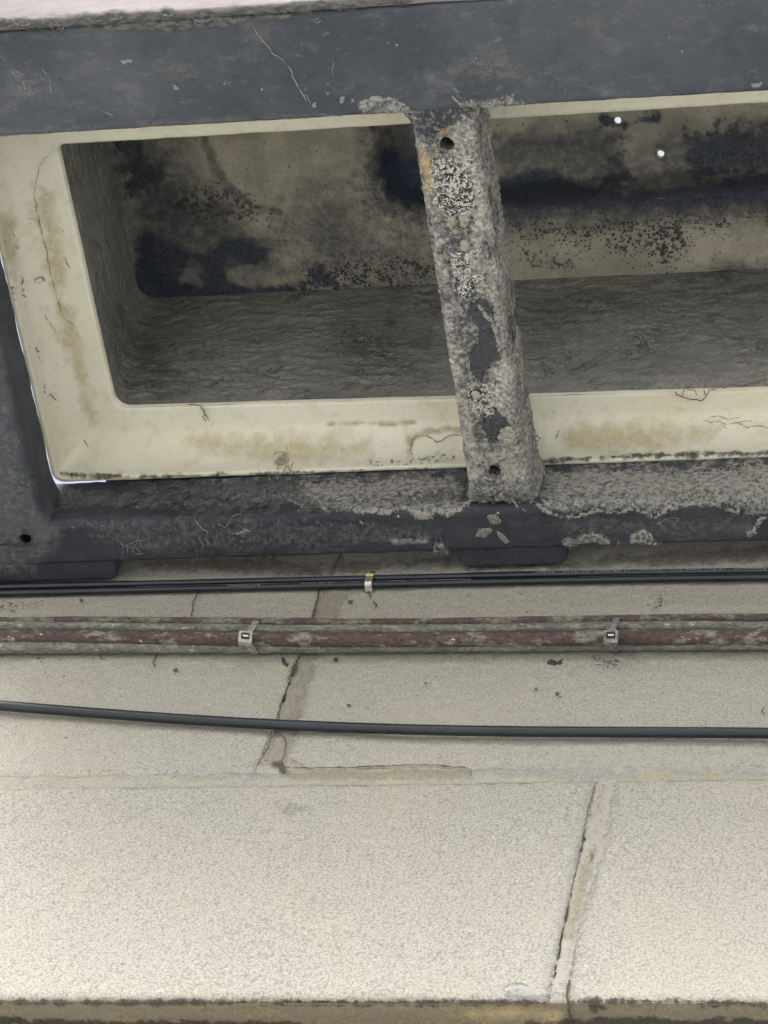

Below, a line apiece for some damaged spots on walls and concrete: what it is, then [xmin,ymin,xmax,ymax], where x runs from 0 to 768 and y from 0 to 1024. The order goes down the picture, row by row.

crack [254,28,311,103]
rust [422,128,455,191]
mould [499,114,768,274]
mould [641,111,661,123]
leakage [114,126,523,510]
peeling [194,458,768,544]
crack [231,653,473,777]
crack [503,778,595,1024]